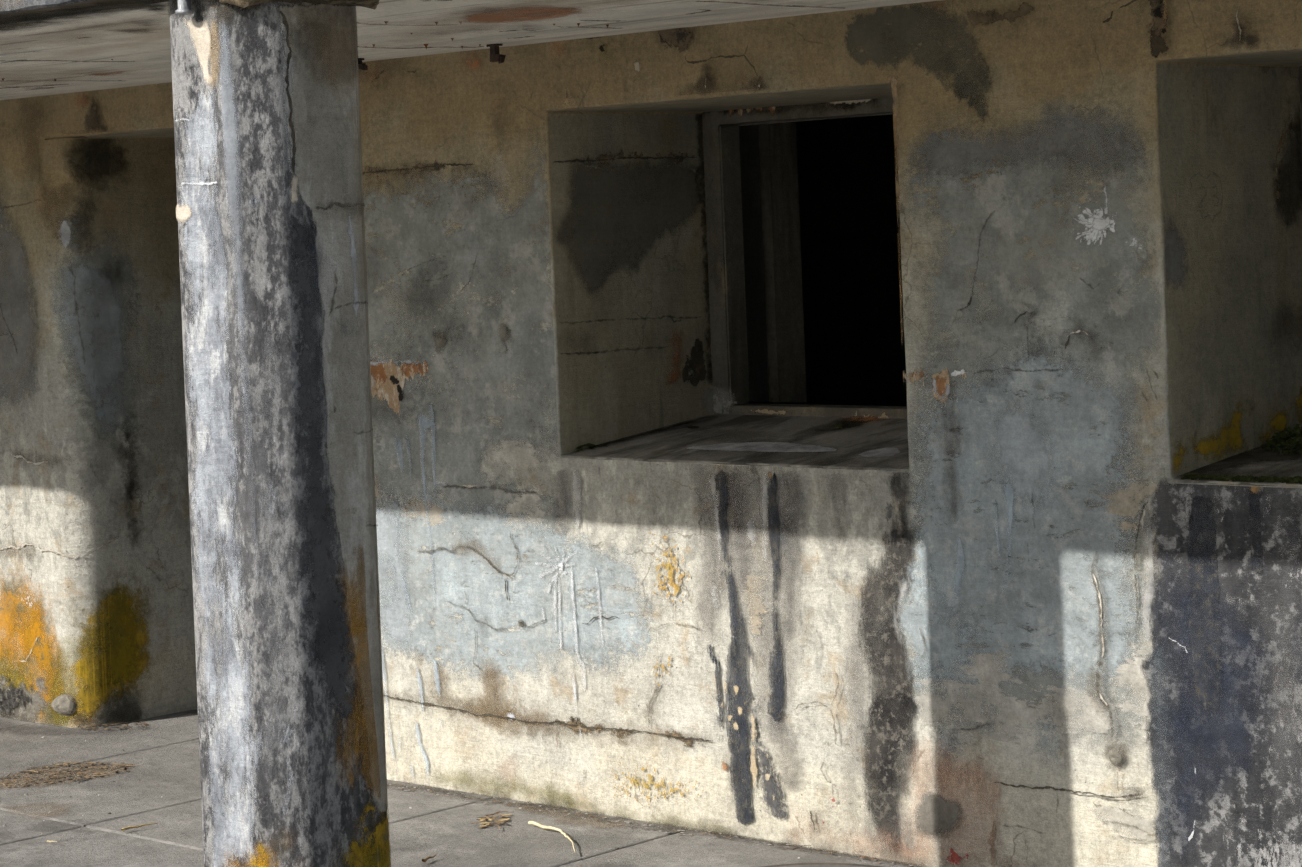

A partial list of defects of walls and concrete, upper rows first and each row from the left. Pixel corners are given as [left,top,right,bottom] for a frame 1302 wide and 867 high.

leakage [553,150,701,293]
leakage [0,0,258,867]
peeling [279,4,429,812]
leakage [858,448,900,457]
crack [417,545,545,669]
crack [383,686,710,747]
leakage [707,470,787,824]
leakage [848,472,915,853]
crack [994,782,1142,807]